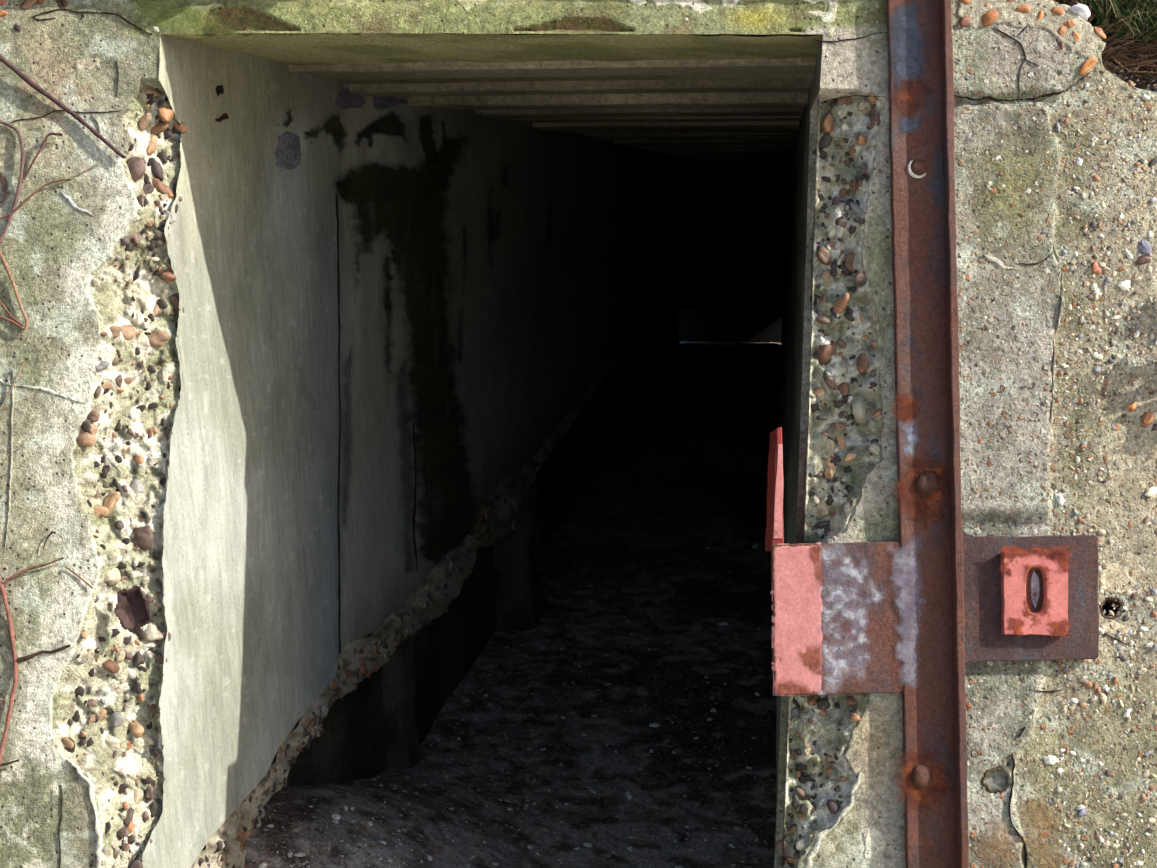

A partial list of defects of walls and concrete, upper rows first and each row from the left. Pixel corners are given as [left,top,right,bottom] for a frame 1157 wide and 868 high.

leakage [304,112,406,151]
spalling [52,85,187,868]
crack [334,194,342,653]
leakage [336,115,478,570]
crack [410,422,418,571]
spalling [191,313,651,868]
rust [799,646,824,674]
rust [810,546,823,582]
spalling [801,93,884,543]
rust [1000,545,1072,636]
spalling [776,693,867,868]
crack [1008,727,1028,868]